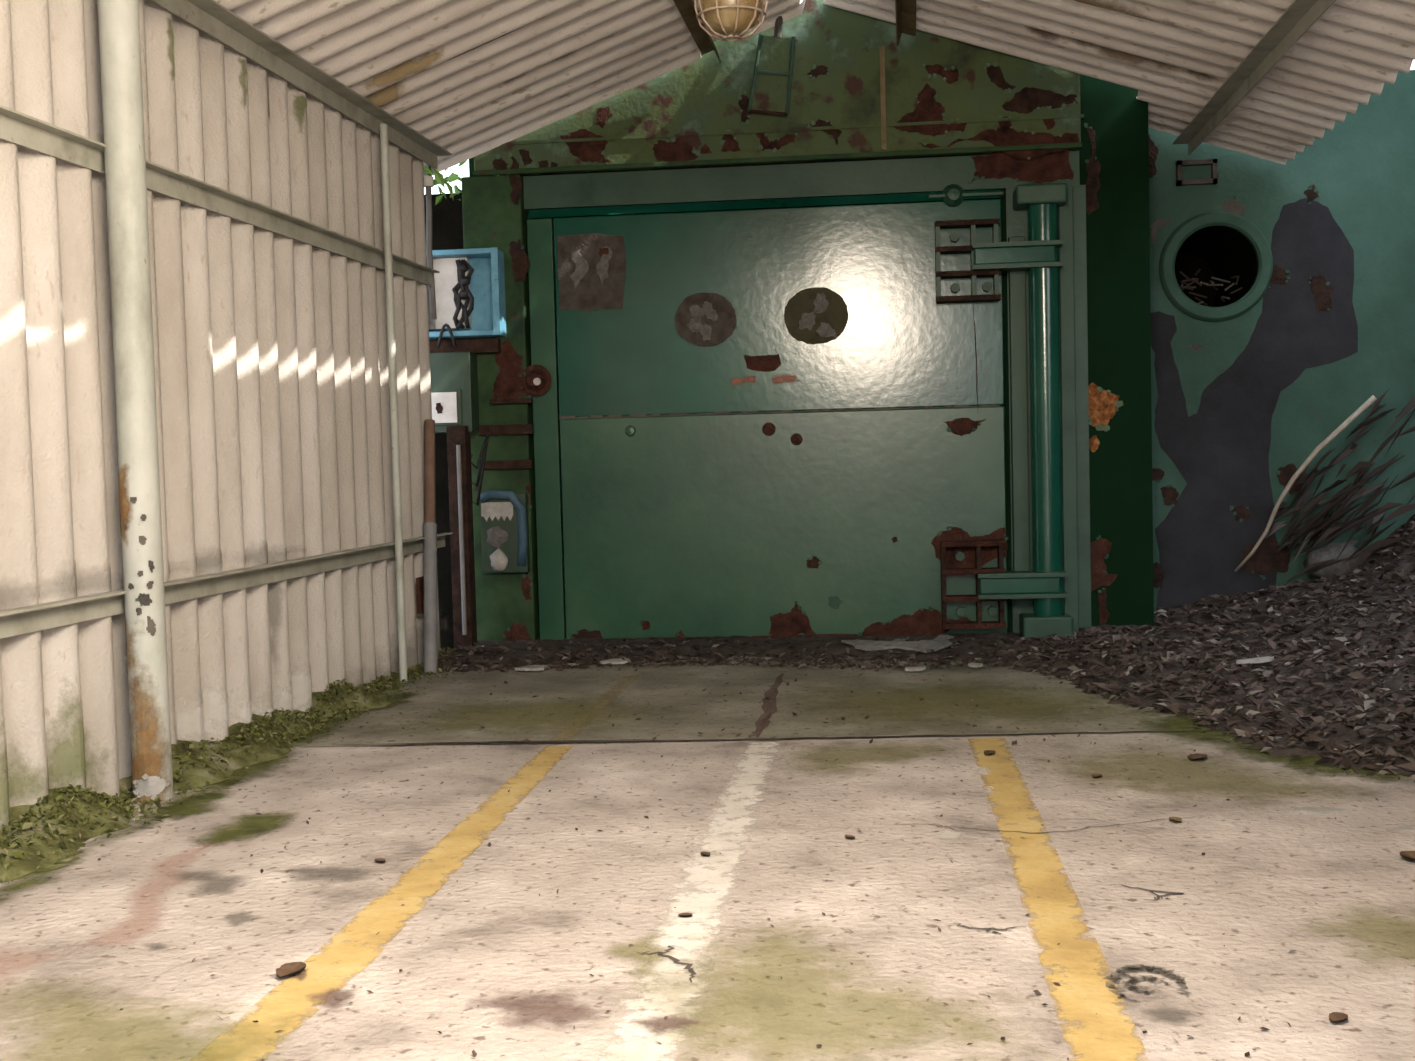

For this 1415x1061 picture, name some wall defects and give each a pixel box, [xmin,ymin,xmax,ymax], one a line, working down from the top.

corrosion [968,123,1101,215]
corrosion [1088,382,1123,452]
corrosion [119,467,131,540]
corrosion [931,526,1008,568]
corrosion [747,601,976,637]
corrosion [125,625,167,803]
crack [305,673,1213,747]
damp [0,704,91,830]
damp [184,872,235,892]
damp [292,868,363,878]
damp [228,913,250,923]